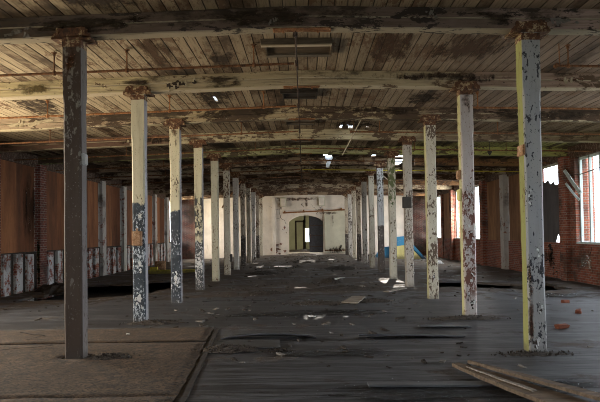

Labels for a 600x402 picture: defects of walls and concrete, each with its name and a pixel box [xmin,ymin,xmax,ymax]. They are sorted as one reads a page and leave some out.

leakage [427,34,508,61]
leakage [14,85,58,115]